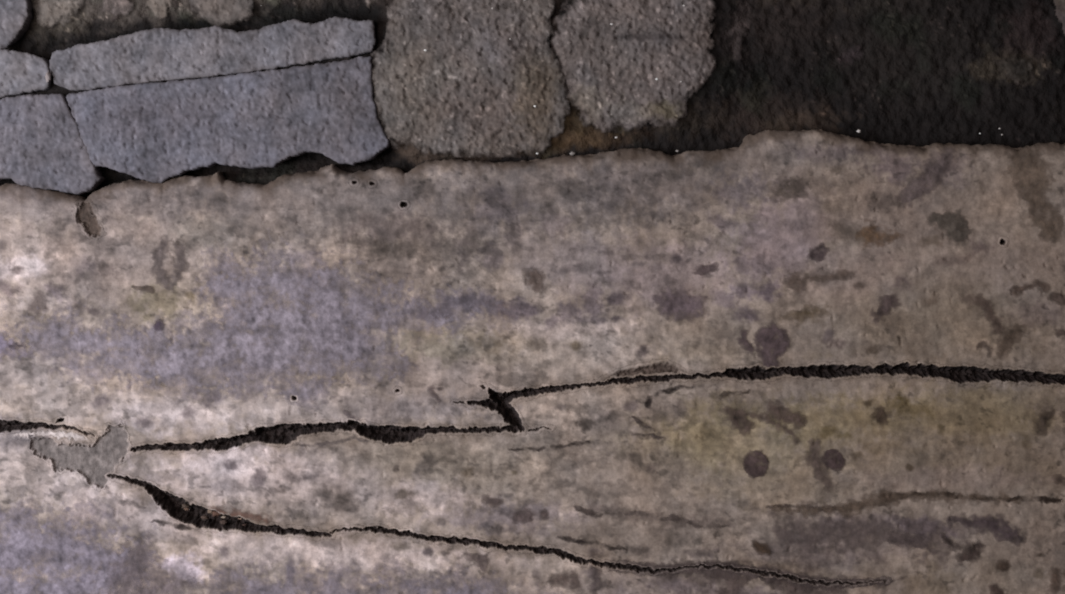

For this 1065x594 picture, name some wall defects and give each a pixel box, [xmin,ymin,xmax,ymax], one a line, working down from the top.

spalling [397,199,411,210]
crack [0,415,98,439]
crack [104,359,1065,589]